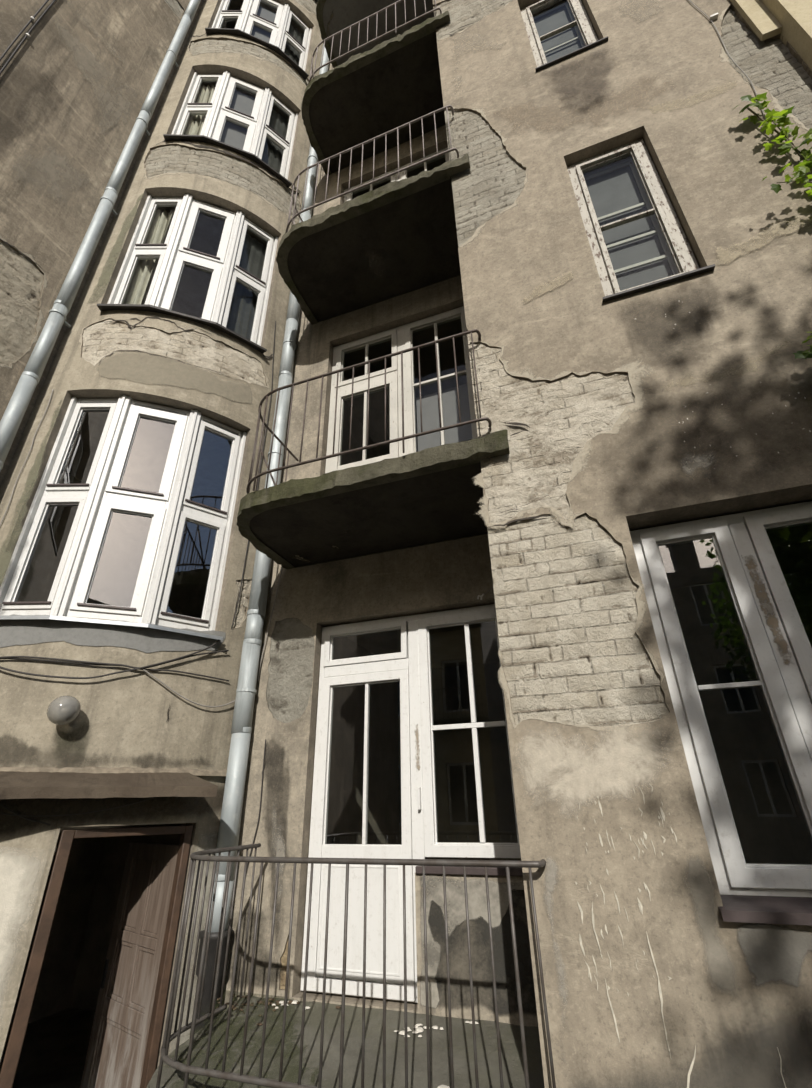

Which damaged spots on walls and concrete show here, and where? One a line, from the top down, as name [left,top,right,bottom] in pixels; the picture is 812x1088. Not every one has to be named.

damp [553,51,610,111]
spalling [720,4,812,131]
spalling [444,107,528,248]
spalling [0,235,48,368]
spalling [79,317,270,389]
damp [630,291,712,362]
damp [661,394,728,475]
spalling [466,327,670,733]
damp [628,1024,812,1088]